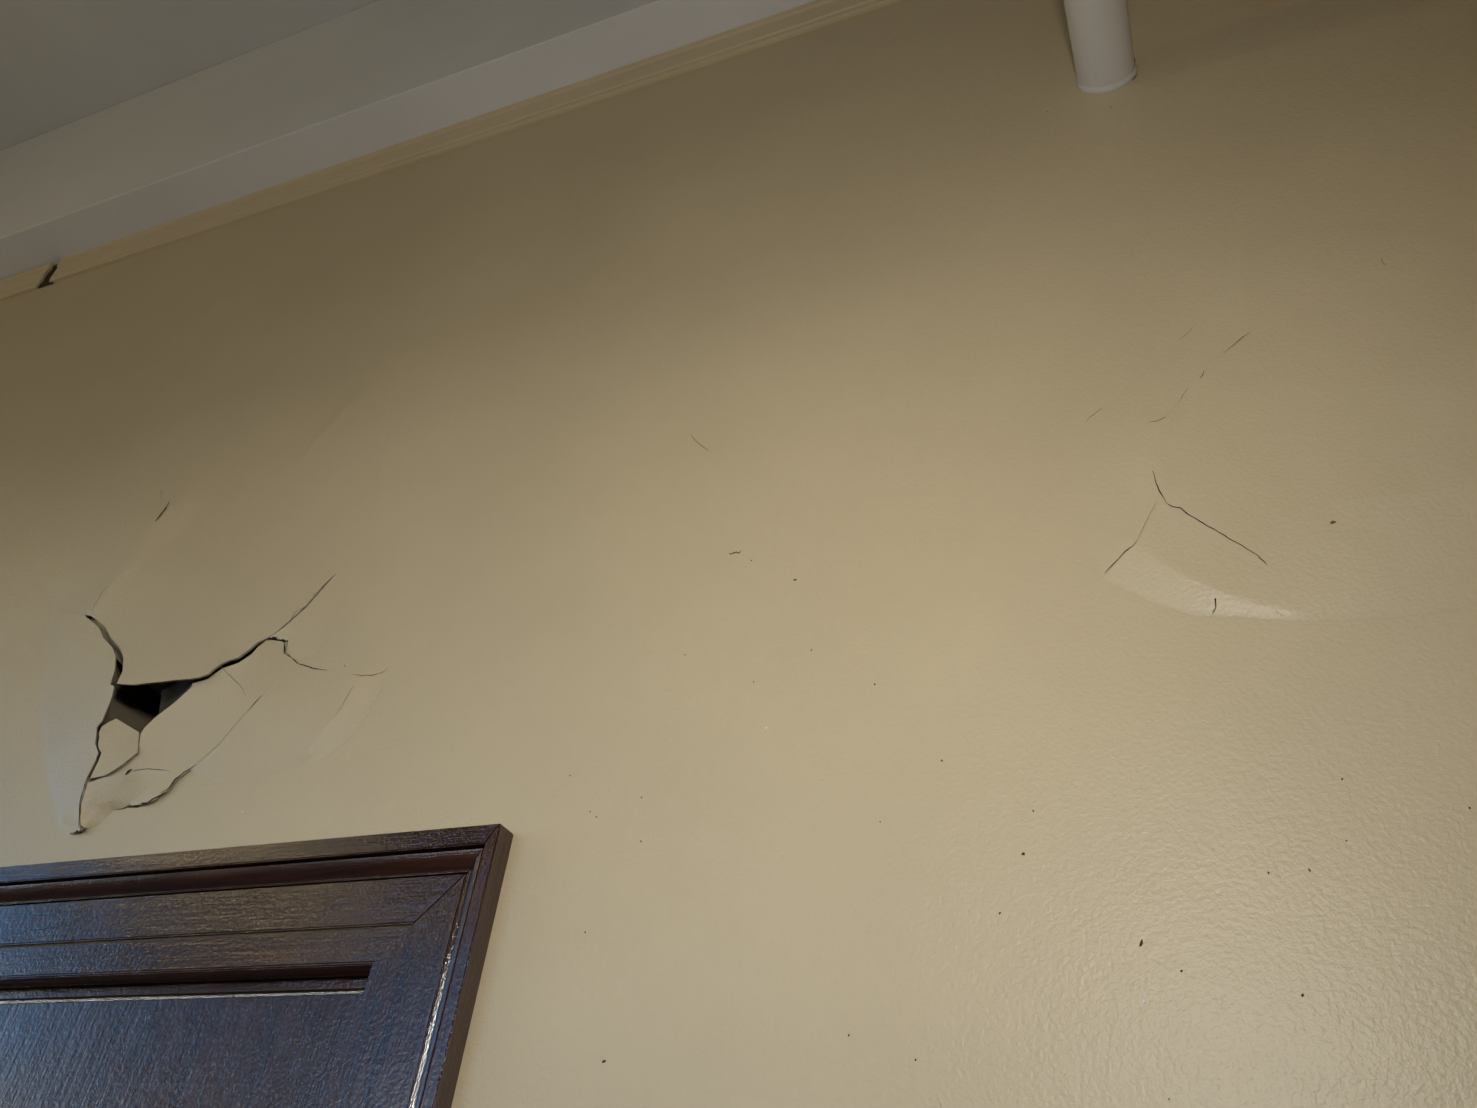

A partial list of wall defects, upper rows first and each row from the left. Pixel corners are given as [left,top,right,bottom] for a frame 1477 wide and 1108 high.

peeling [89,641,265,779]
crack [125,662,257,808]
crack [268,599,385,710]